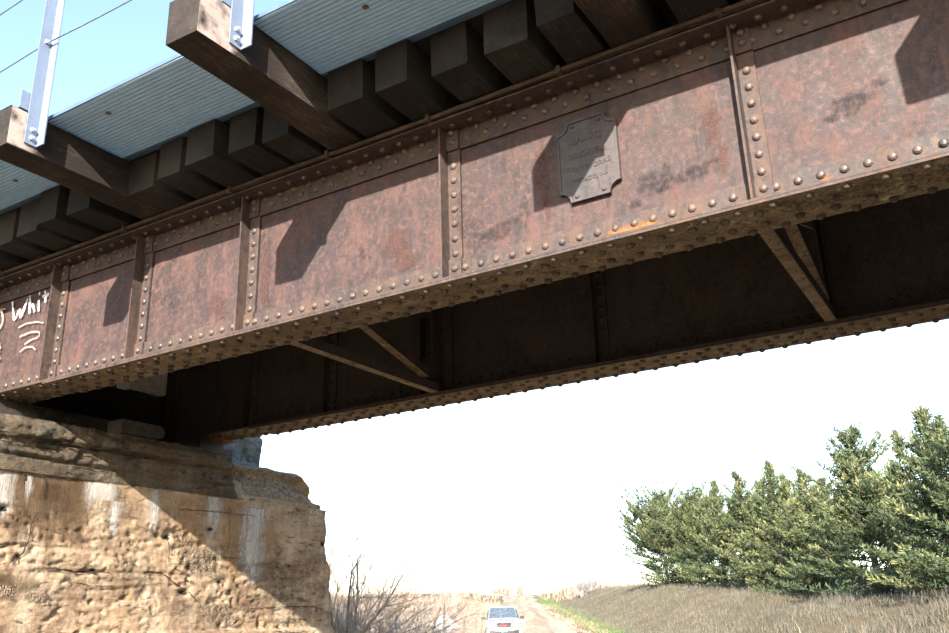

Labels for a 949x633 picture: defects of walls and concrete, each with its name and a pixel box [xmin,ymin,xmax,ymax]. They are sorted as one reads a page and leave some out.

corrosion [611,221,655,235]
crack [32,439,160,466]
crack [10,474,46,565]
damp [0,471,124,543]
damp [149,490,159,525]
crack [181,509,256,559]
damp [0,575,37,592]
crack [43,567,114,588]
crack [145,542,196,599]